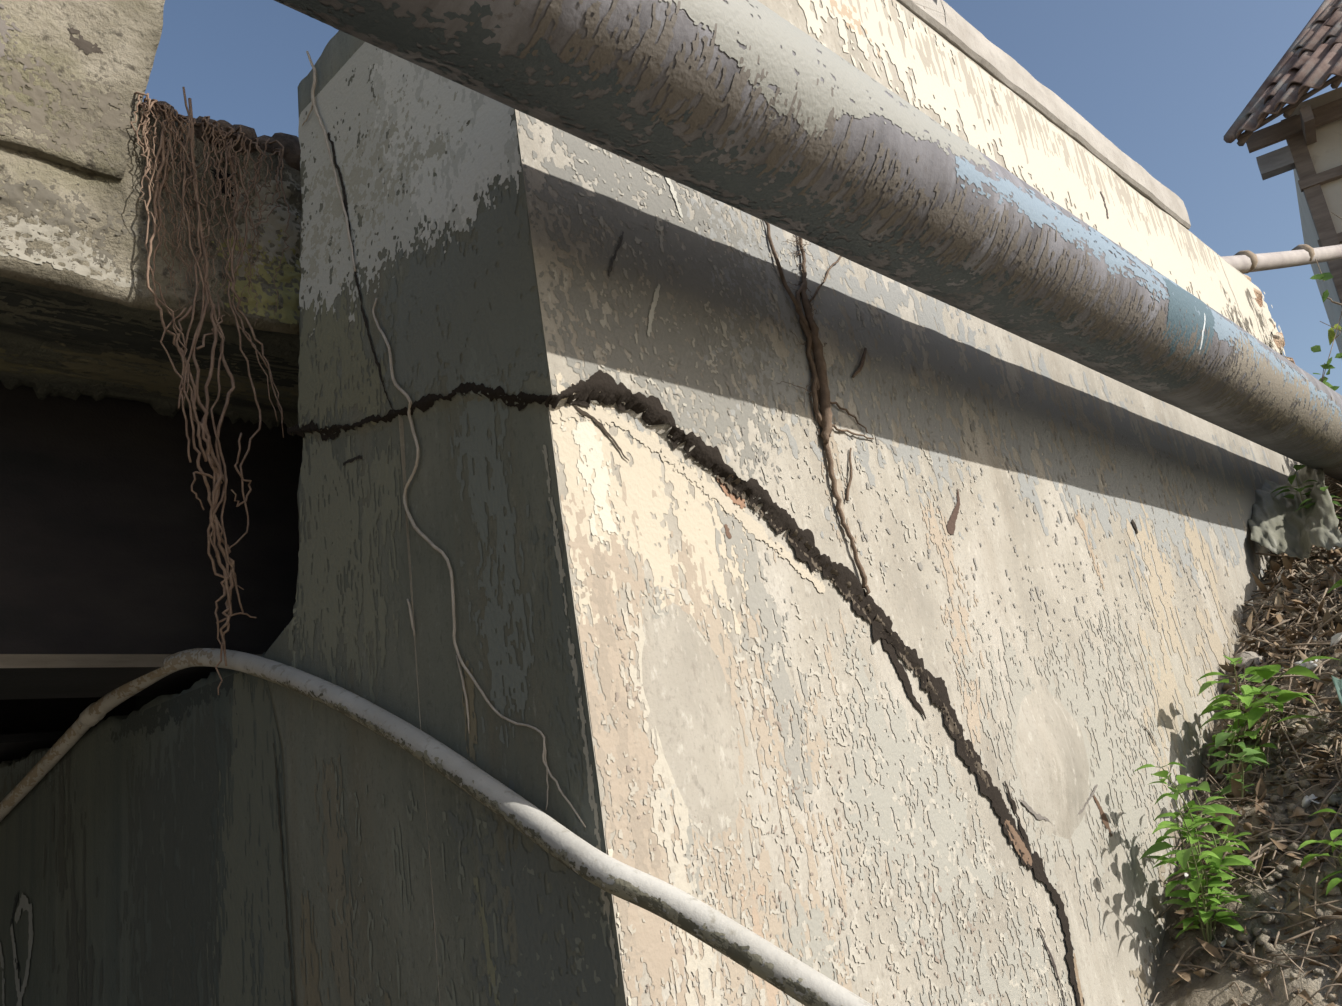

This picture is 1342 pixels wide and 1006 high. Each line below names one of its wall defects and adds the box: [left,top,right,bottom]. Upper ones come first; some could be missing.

leakage [391,787,804,1006]
leakage [0,111,1280,748]
crack [287,132,1098,1006]
leakage [529,414,1077,1006]
leakage [946,566,1244,1006]